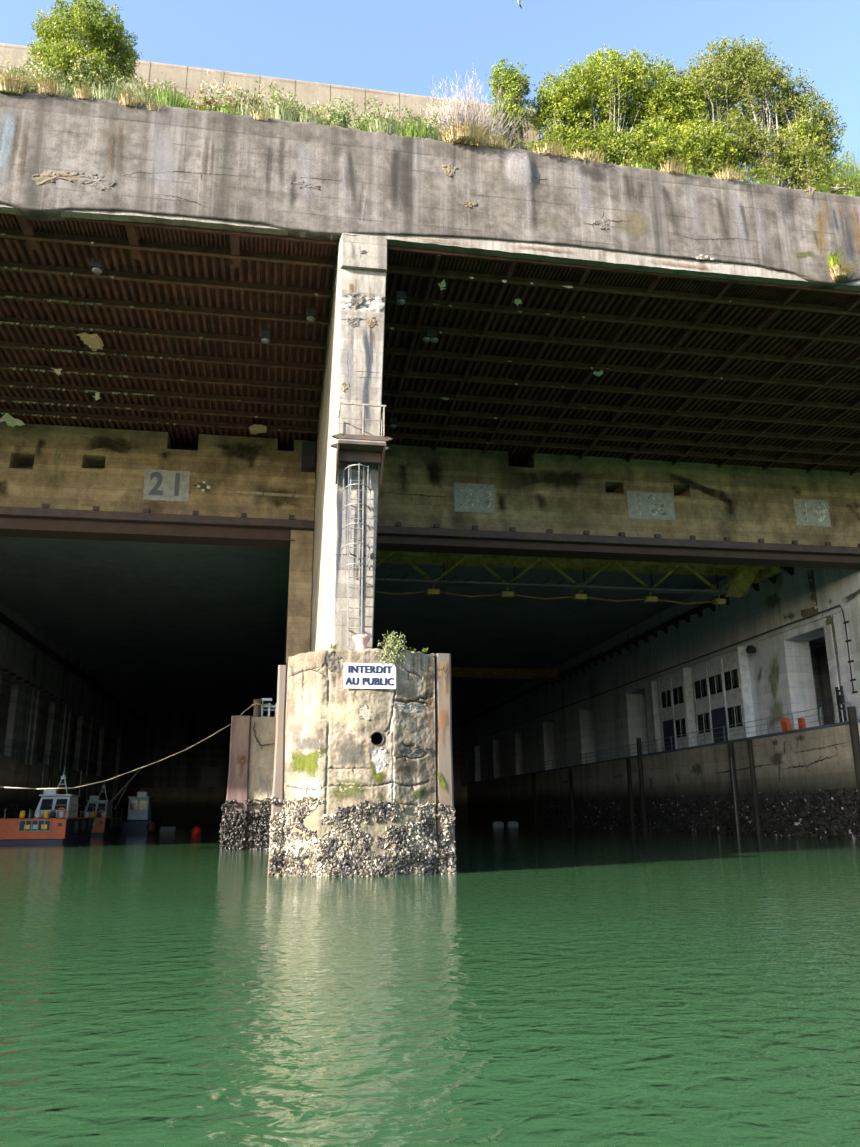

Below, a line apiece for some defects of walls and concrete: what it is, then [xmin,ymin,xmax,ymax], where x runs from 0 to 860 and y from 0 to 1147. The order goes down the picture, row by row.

damp [0,115,25,174]
spalling [31,170,115,190]
spalling [338,294,394,330]
peeling [0,321,122,355]
damp [361,328,372,431]
damp [673,474,733,515]
spalling [370,747,387,774]
crack [716,741,851,776]